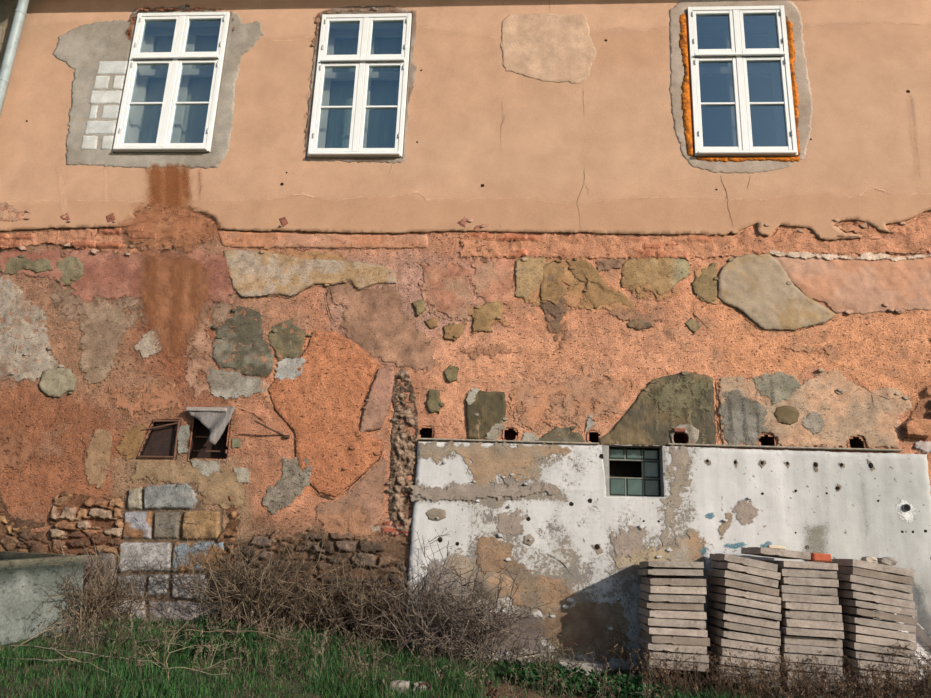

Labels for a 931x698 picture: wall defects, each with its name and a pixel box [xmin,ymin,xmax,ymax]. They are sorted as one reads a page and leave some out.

flaking render [0,202,931,497]
flaking render [78,424,246,622]
peeling [410,372,637,662]
peeling [610,445,706,577]
peeling [718,497,759,540]